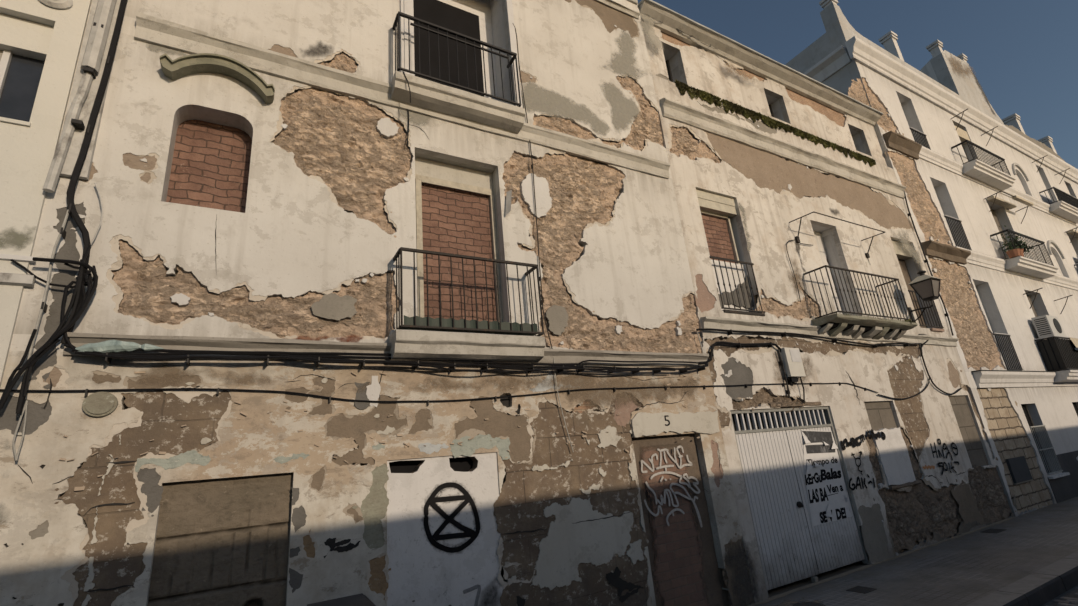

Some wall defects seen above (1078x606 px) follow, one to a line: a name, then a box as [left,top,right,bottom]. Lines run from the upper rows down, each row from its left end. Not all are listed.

flaking render [123,153,159,184]
spalling [270,86,412,238]
spalling [106,234,398,341]
spalling [502,149,1053,556]
spalling [55,370,248,606]
spalling [274,374,652,606]